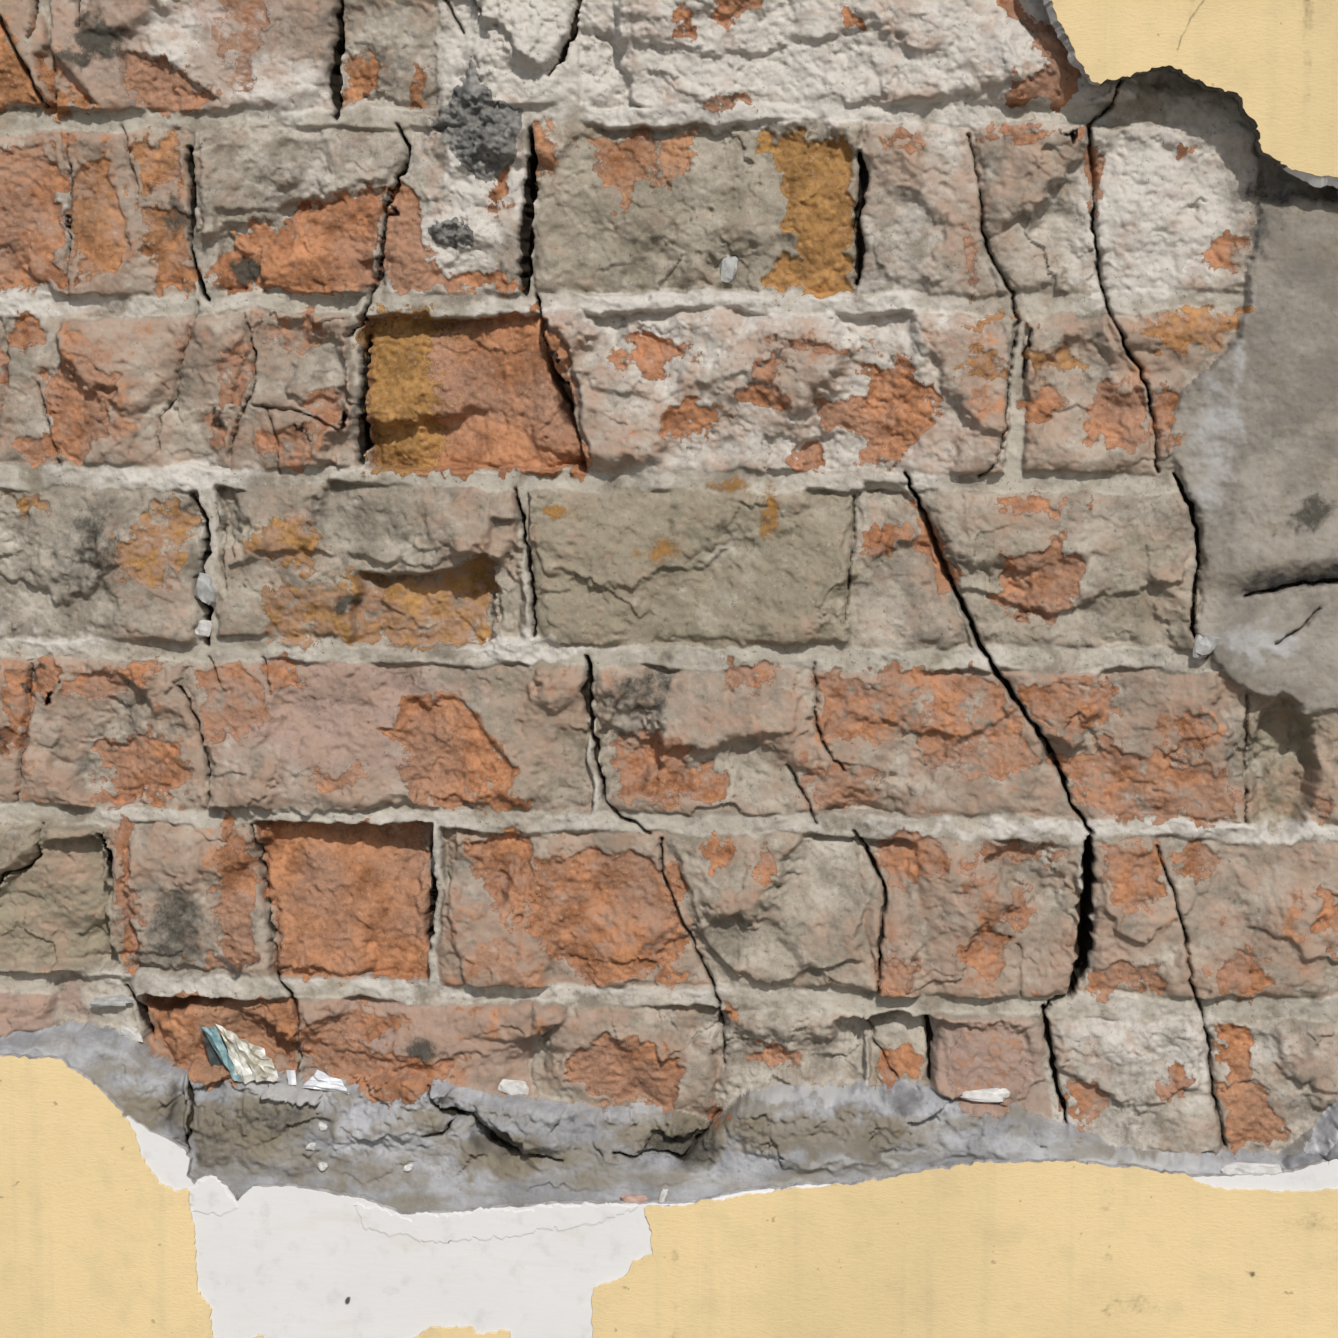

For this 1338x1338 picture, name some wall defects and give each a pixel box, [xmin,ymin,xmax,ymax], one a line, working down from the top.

spalling [996,0,1106,218]
spalling [0,0,593,493]
crack [349,126,411,336]
spalling [659,334,944,474]
crack [1090,190,1151,413]
spalling [954,140,1338,717]
spalling [192,513,502,746]
crack [580,655,668,883]
crack [946,574,1092,831]
crack [1155,459,1200,638]
spalling [0,652,1338,1338]
crack [1158,849,1226,1145]